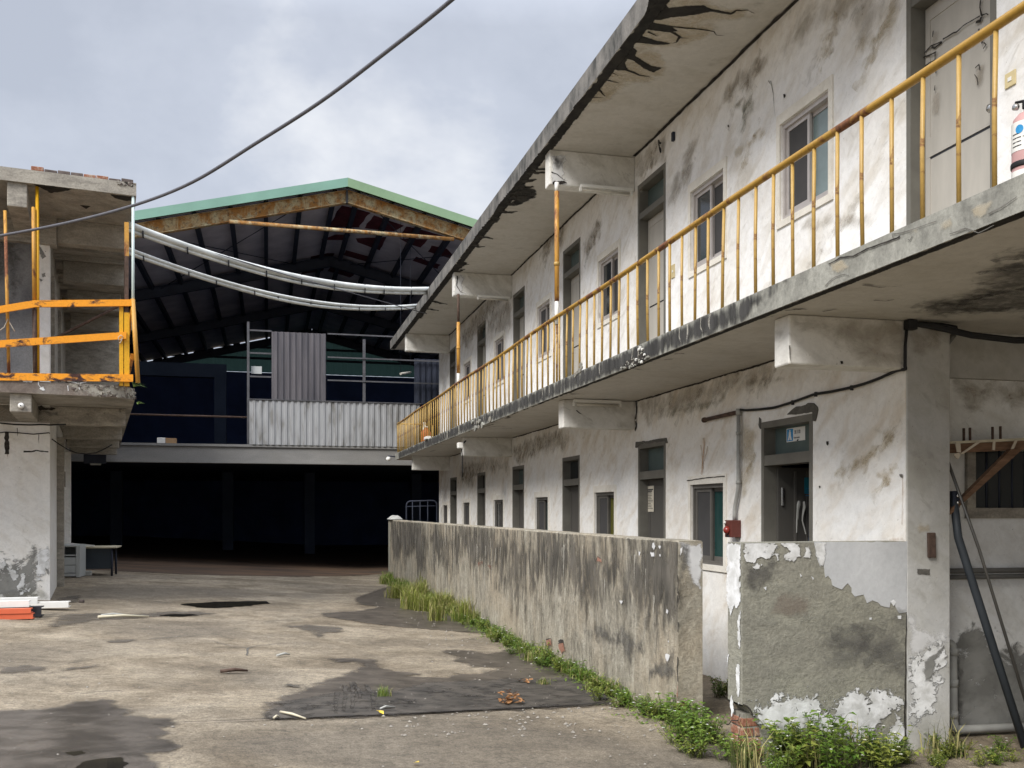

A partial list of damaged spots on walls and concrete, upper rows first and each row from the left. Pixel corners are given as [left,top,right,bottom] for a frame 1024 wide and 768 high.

damp [391,0,752,349]
damp [397,212,1024,463]
damp [290,586,485,636]
damp [390,521,702,630]
damp [649,656,674,677]
peeling [726,541,1024,747]